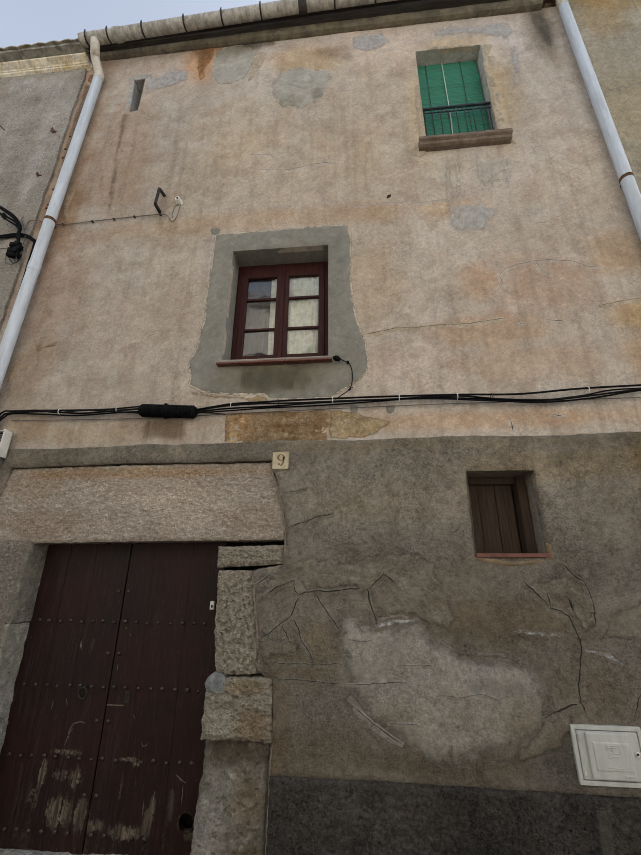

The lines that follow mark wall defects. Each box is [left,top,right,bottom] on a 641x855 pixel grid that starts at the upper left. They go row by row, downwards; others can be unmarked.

flaking render [224,410,390,443]
crack [252,572,398,662]
crack [520,562,600,723]
crack [345,680,421,747]